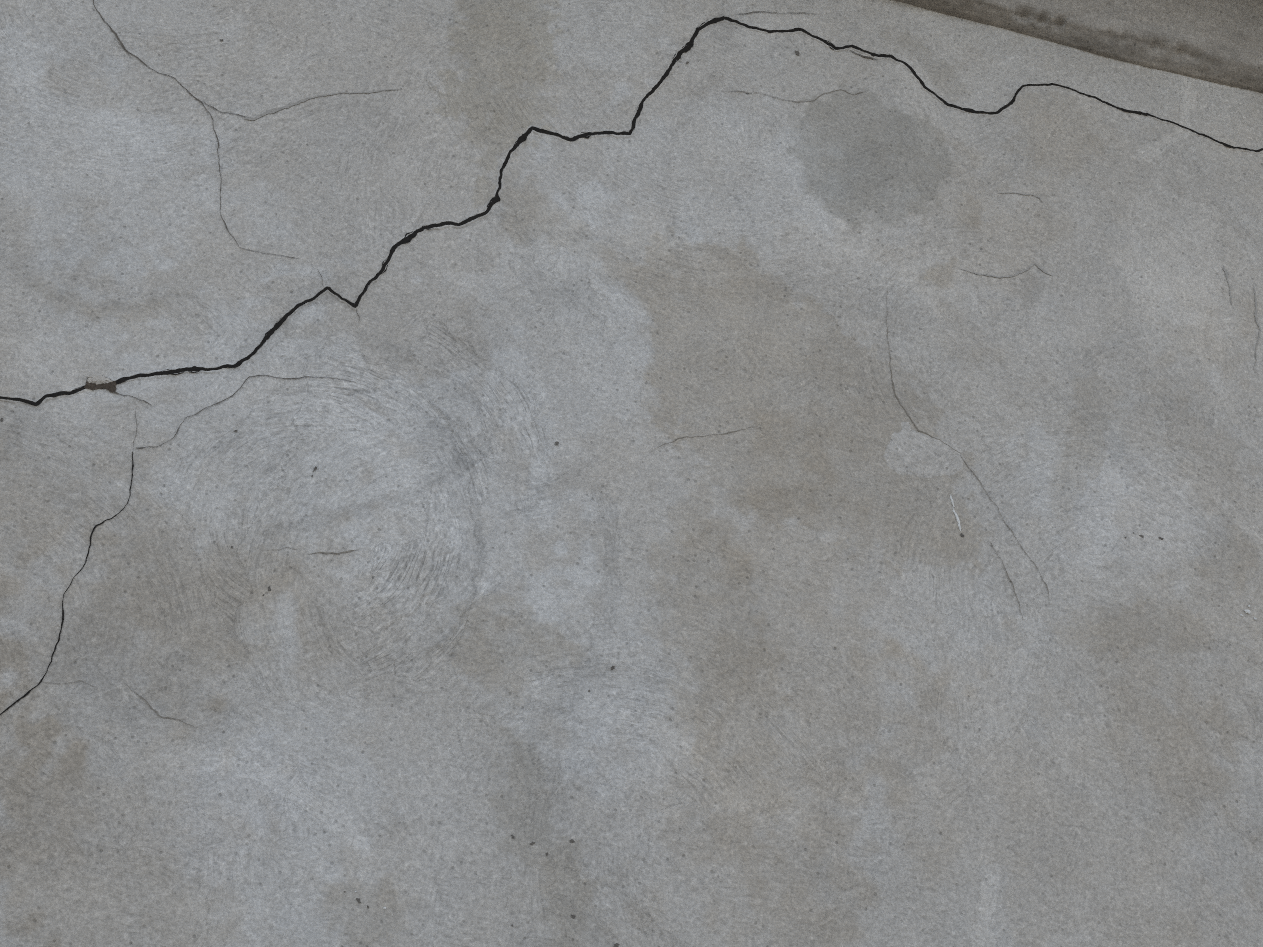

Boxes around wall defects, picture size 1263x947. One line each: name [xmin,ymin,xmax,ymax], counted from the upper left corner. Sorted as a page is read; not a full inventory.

crack [126,684,192,726]
crack [0,0,1263,715]
leakage [421,0,999,947]
leakage [780,22,1116,241]